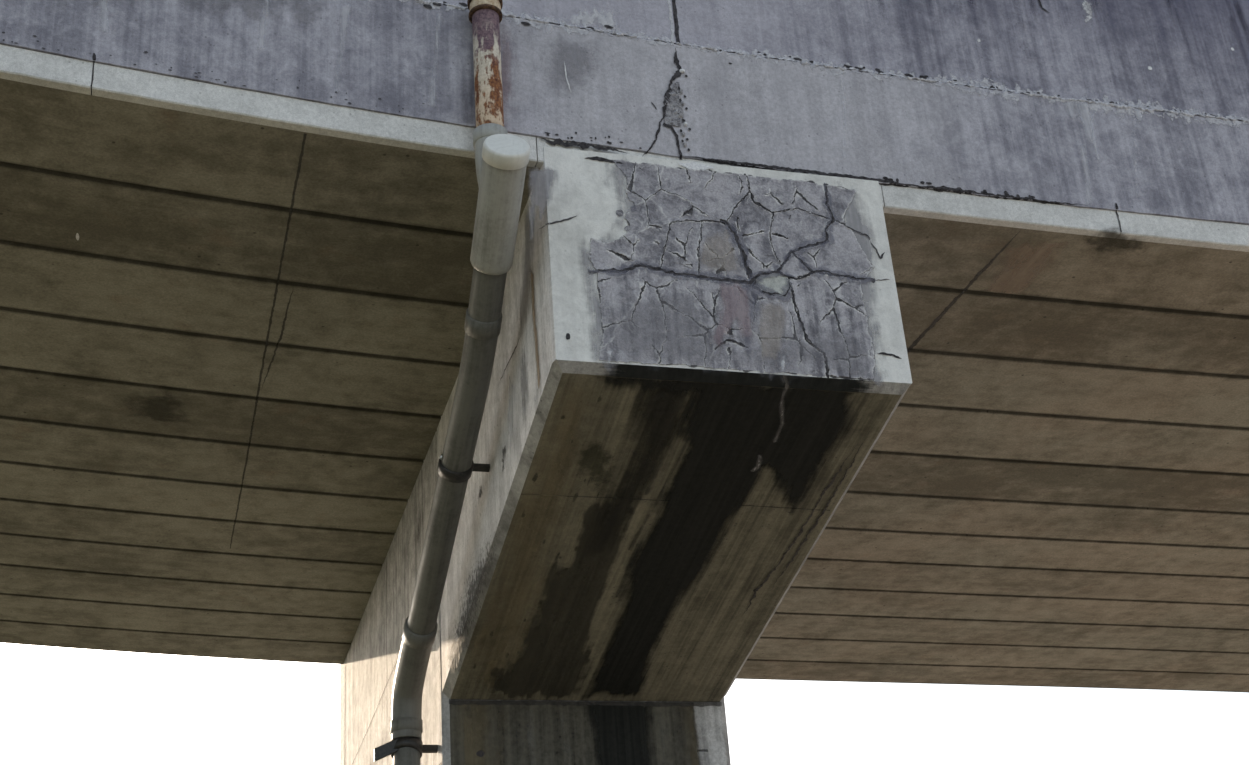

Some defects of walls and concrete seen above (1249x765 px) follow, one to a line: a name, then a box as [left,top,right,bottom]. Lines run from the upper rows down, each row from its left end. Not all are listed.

crack [230,133,307,549]
crack [586,48,691,170]
water stain [448,197,881,765]
crack [588,174,889,379]